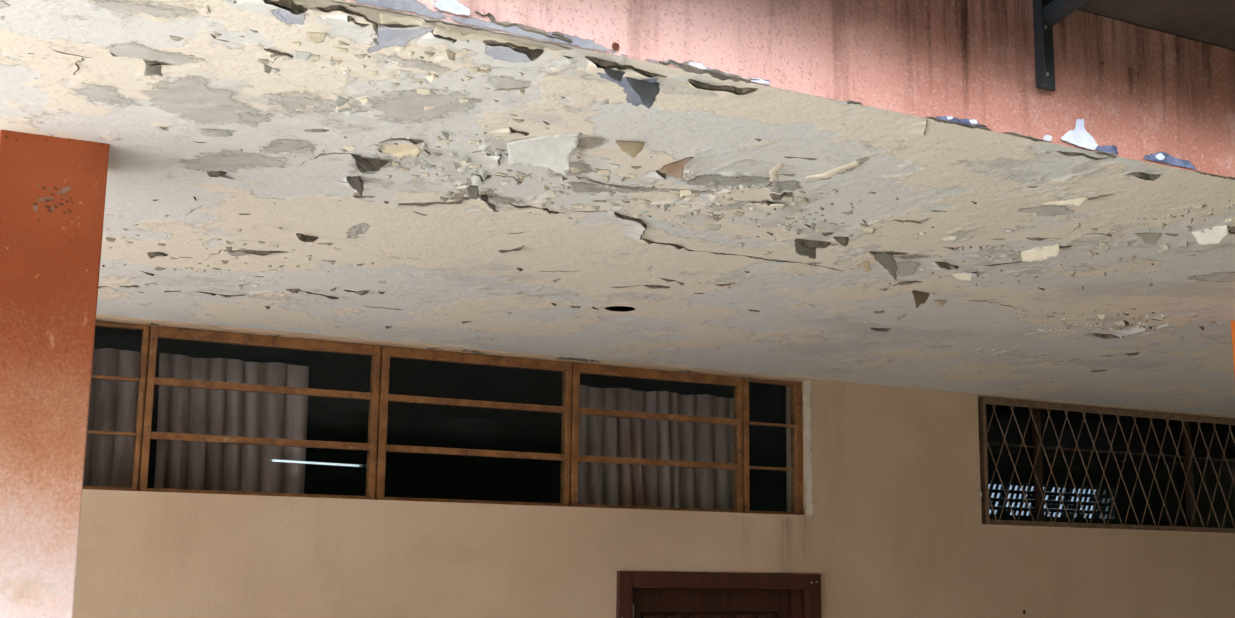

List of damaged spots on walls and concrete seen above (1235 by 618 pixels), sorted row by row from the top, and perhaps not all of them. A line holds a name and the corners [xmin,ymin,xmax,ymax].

peeling [33,185,74,222]
crack [179,130,308,216]
crack [98,192,841,329]
peeling [1123,151,1235,181]
peeling [1129,199,1235,287]